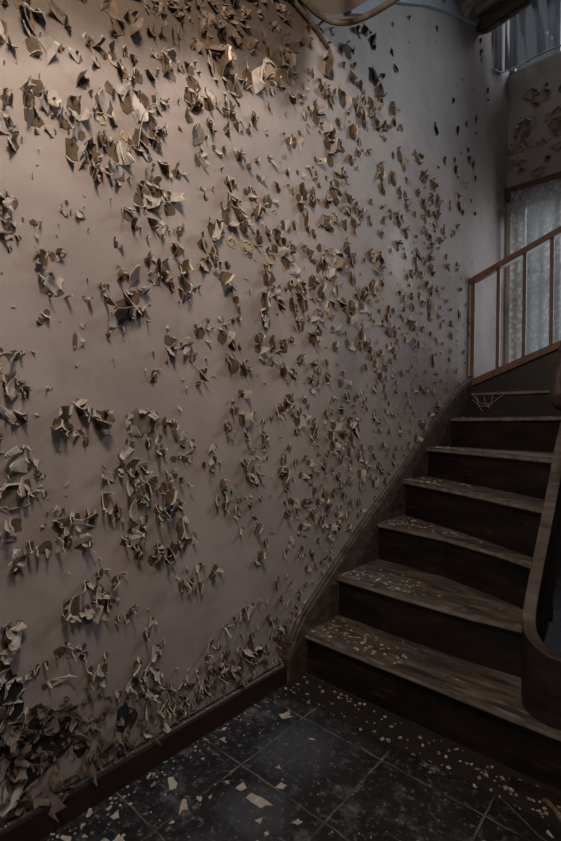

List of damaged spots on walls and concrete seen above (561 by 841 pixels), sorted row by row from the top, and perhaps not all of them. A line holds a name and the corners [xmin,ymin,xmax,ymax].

peeling [0,0,478,576]
peeling [507,82,561,178]
peeling [0,408,315,826]